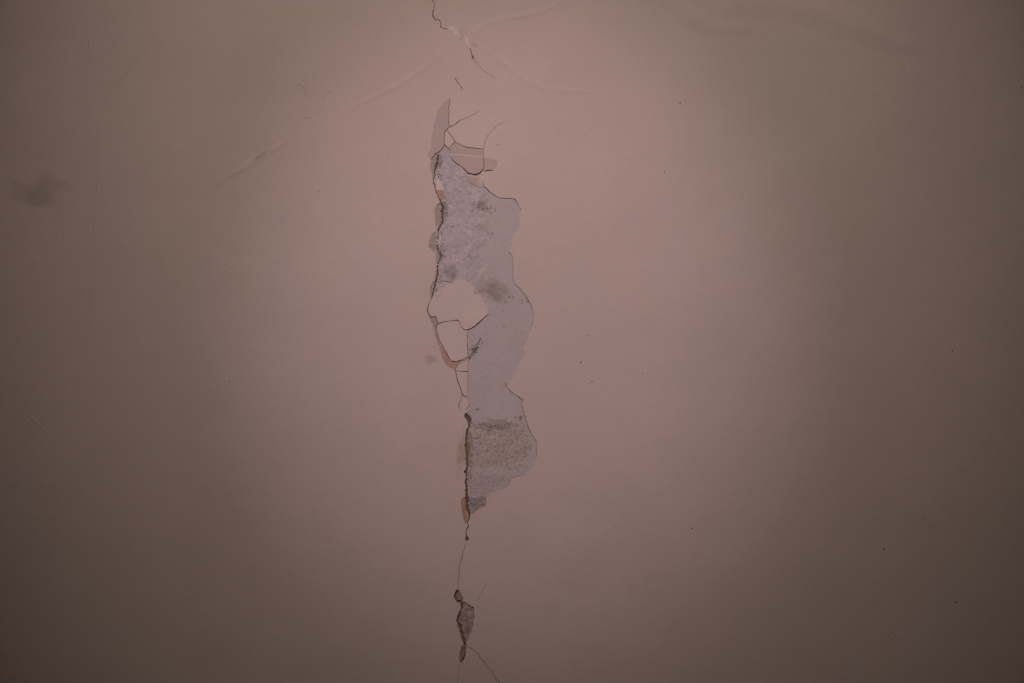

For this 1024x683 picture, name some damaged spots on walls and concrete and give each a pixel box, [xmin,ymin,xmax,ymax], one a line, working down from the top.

crack [432,0,489,74]
crack [430,77,489,299]
peeling [427,82,537,524]
crack [454,368,472,581]
spalling [454,589,474,683]
crack [458,646,500,683]